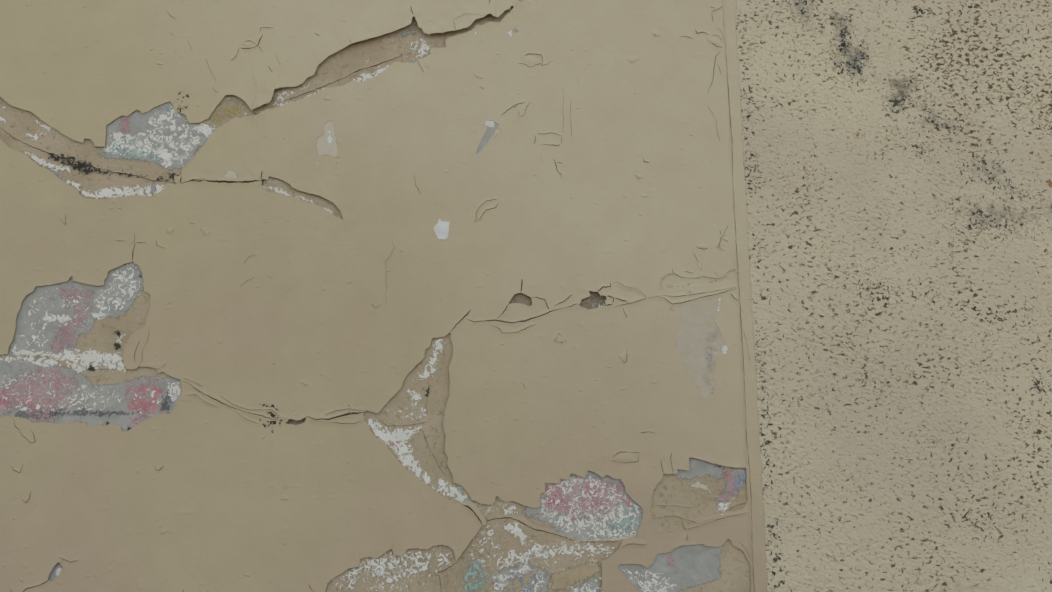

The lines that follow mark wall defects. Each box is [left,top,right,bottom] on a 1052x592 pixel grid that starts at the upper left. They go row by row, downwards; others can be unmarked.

crack [204,25,274,94]
peeling [0,0,527,207]
crack [277,39,430,104]
crack [0,124,269,188]
peeling [248,167,351,227]
crack [115,232,168,261]
spalling [572,282,613,317]
crack [448,0,757,592]
peeling [0,255,189,445]
crack [11,329,448,477]
peeling [304,324,761,592]
crack [8,555,81,592]